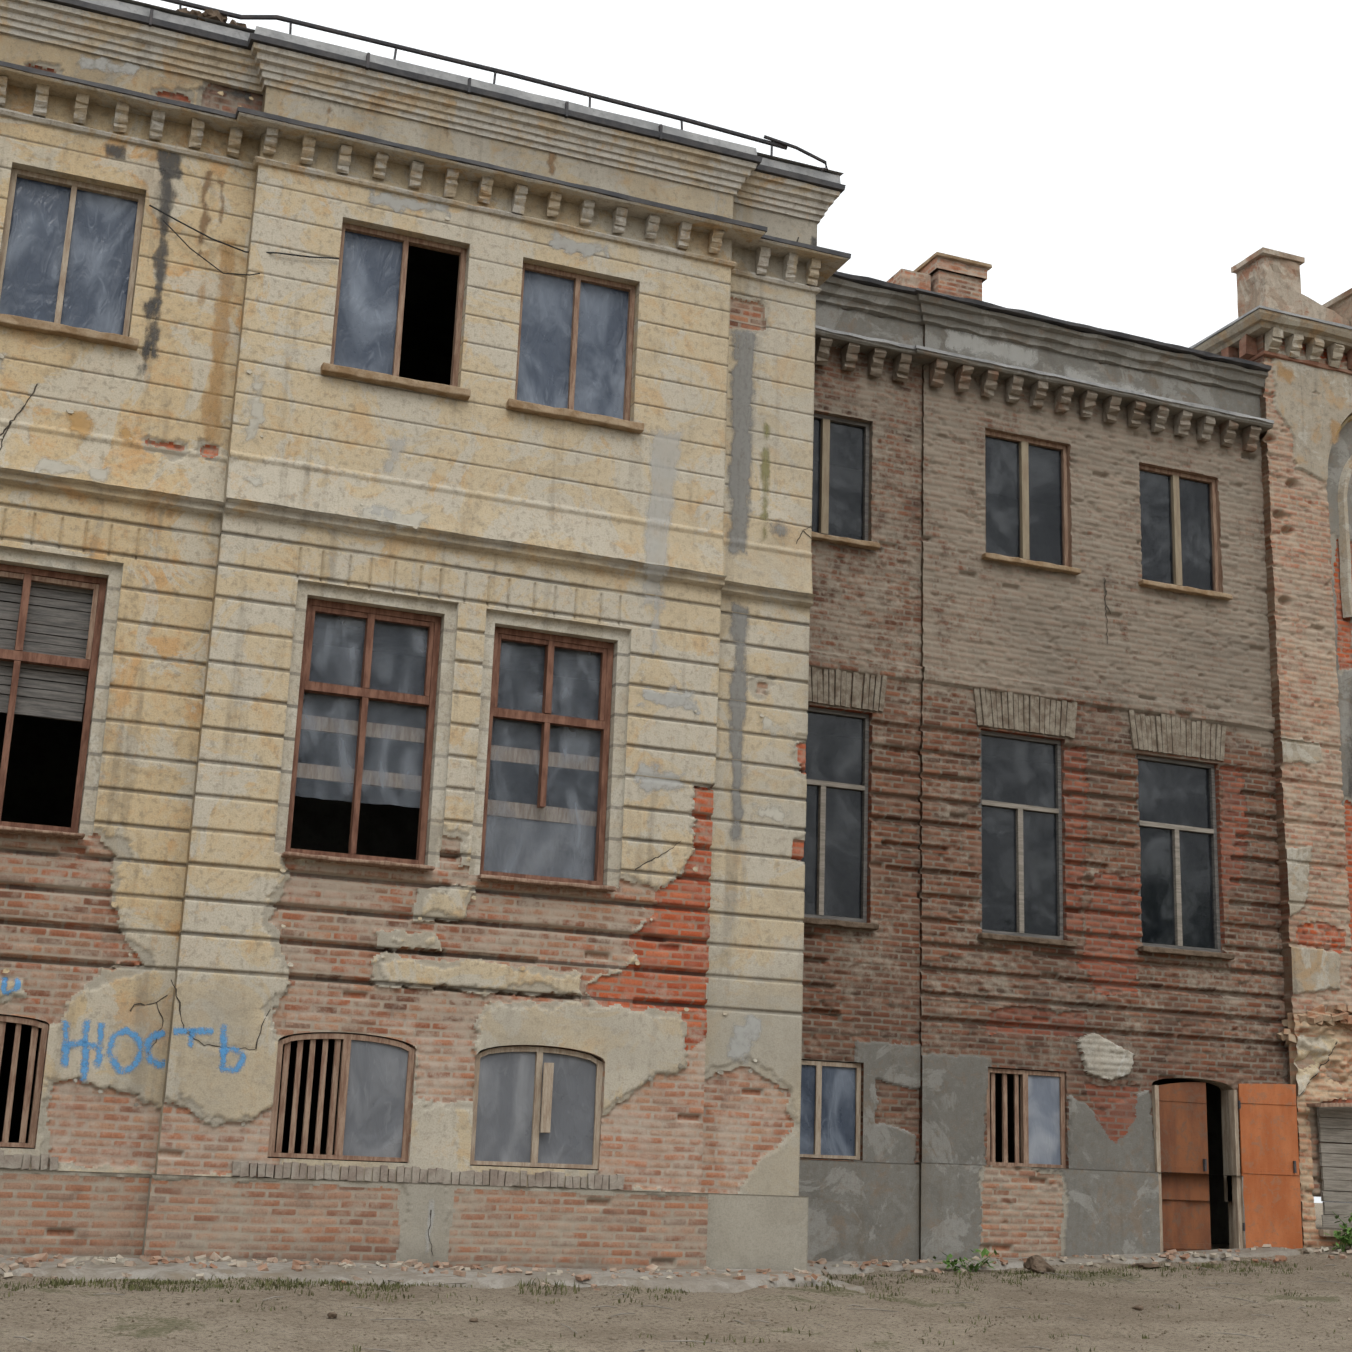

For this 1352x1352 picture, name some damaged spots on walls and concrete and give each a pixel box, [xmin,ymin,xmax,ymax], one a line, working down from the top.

leakage [142,168,176,368]
crack [0,384,38,450]
peeling [35,458,108,481]
peeling [637,679,700,715]
flaking render [791,839,805,862]
flaking render [0,833,144,1025]
flaking render [268,763,794,1271]